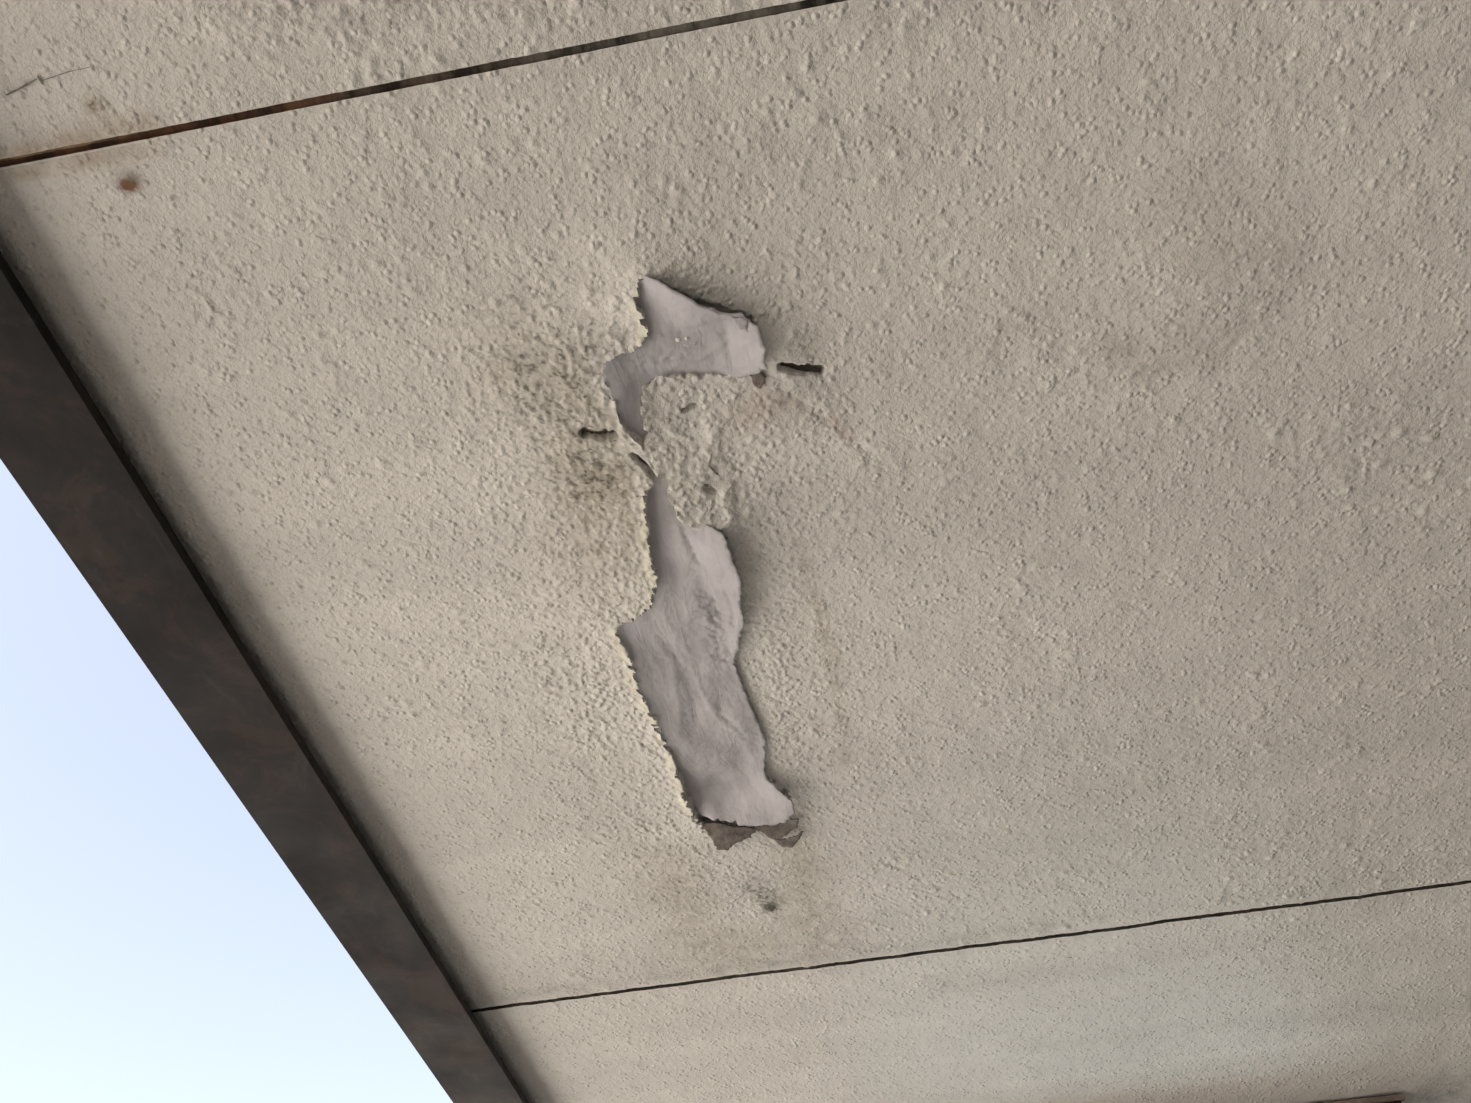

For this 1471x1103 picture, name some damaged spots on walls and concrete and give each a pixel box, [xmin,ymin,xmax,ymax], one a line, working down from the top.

peeling [600,275,768,441]
peeling [610,474,803,851]